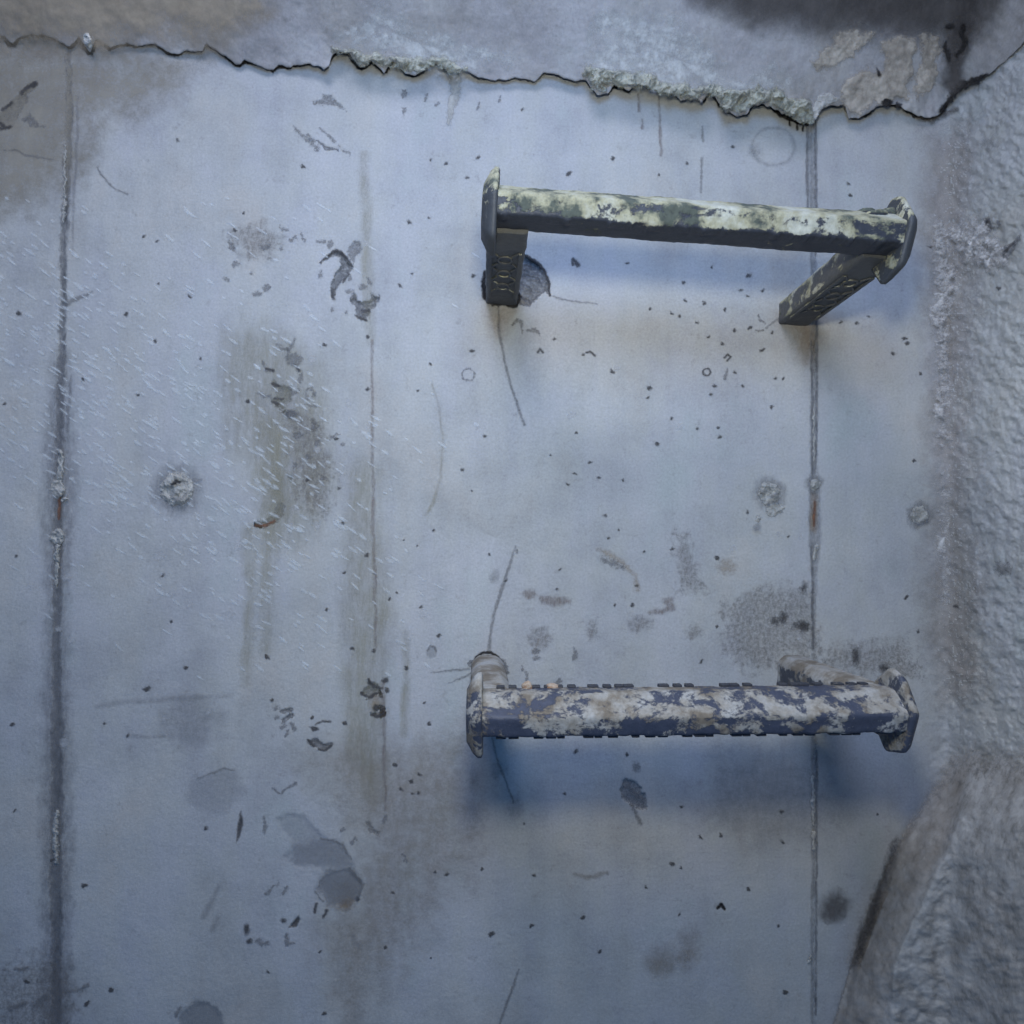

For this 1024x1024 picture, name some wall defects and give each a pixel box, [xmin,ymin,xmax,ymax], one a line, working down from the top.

peeling [812,23,971,119]
spalling [0,81,37,130]
spalling [518,255,551,306]